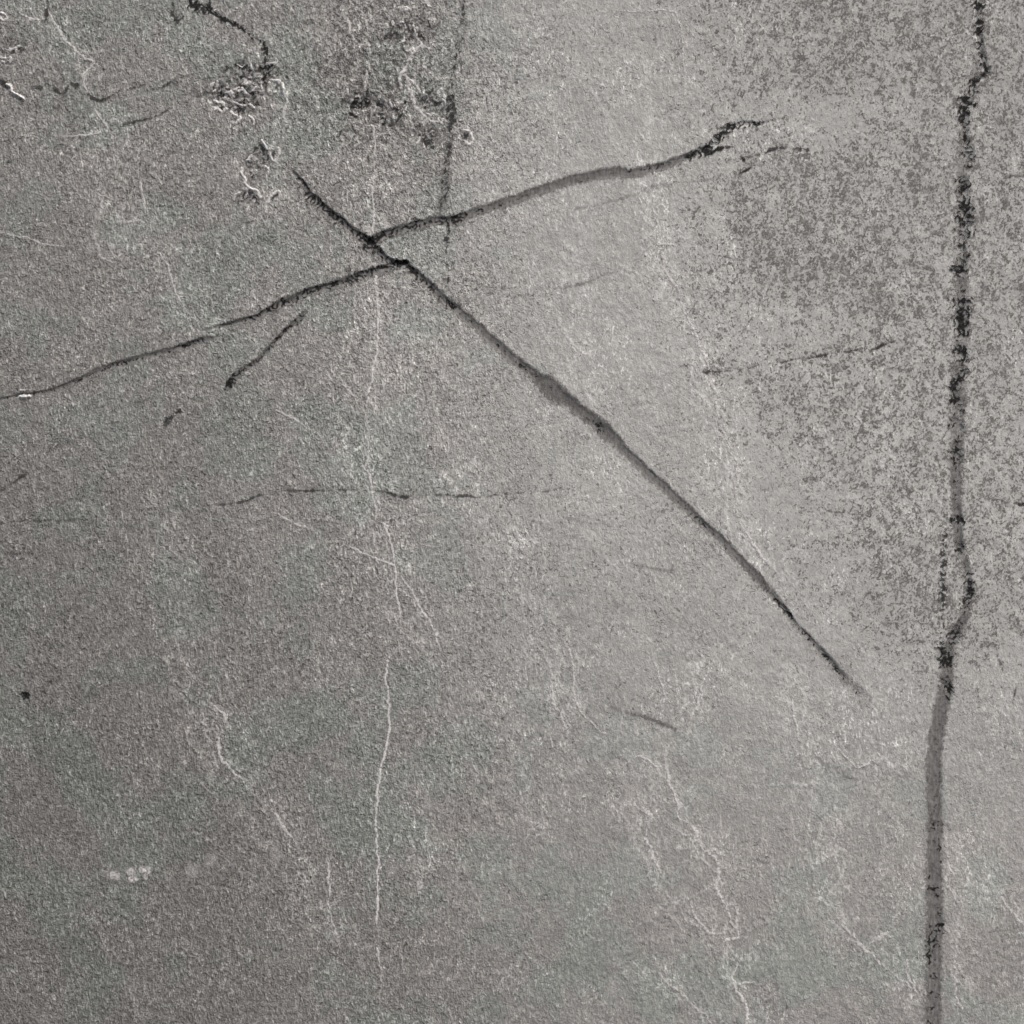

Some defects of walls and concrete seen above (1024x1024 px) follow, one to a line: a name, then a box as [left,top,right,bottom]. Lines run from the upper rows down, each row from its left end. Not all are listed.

crack [0,0,857,694]
crack [780,343,888,363]
crack [924,0,992,1024]